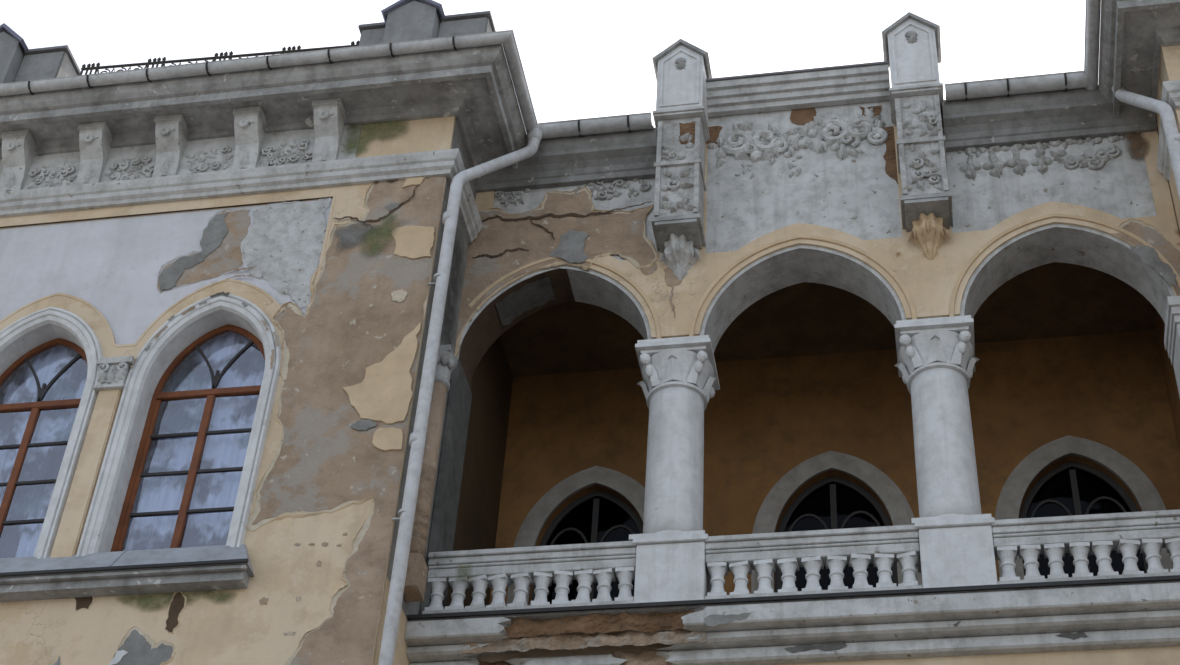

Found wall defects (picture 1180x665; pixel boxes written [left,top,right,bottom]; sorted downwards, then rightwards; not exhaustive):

damp [346,120,405,153]
flaking render [790,107,816,125]
peeling [130,292,230,368]
crack [472,201,652,258]
flaking render [456,187,683,390]
crack [668,286,676,318]
flaking render [1111,218,1180,296]
flaking render [156,176,445,665]
flaking render [109,592,187,665]